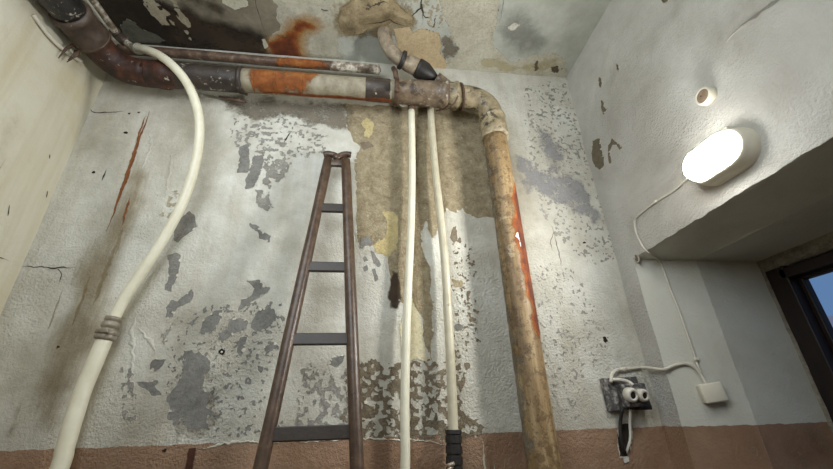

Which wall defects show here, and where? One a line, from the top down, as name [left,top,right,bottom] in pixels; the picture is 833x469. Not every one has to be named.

peeling [143,0,281,53]
rust [249,18,392,102]
crack [412,0,436,28]
rust [106,111,150,231]
peeling [230,111,328,212]
peeling [407,0,623,265]
crack [23,266,75,282]
peeling [119,211,285,438]
flaking render [288,355,348,426]
flaking render [344,103,494,442]
peeling [530,262,609,422]
spalling [617,422,633,463]